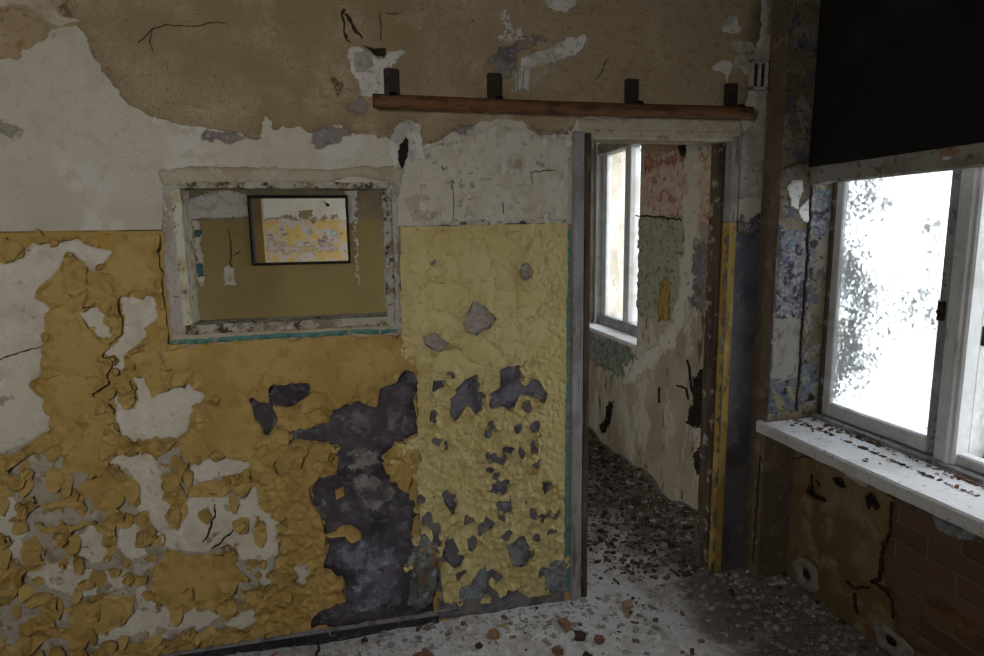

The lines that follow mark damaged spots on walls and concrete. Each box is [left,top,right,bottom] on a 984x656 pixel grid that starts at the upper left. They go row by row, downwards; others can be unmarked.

peeling [0,0,773,656]
flaking render [767,0,833,419]
crack [845,501,895,619]
flaking render [865,492,984,656]